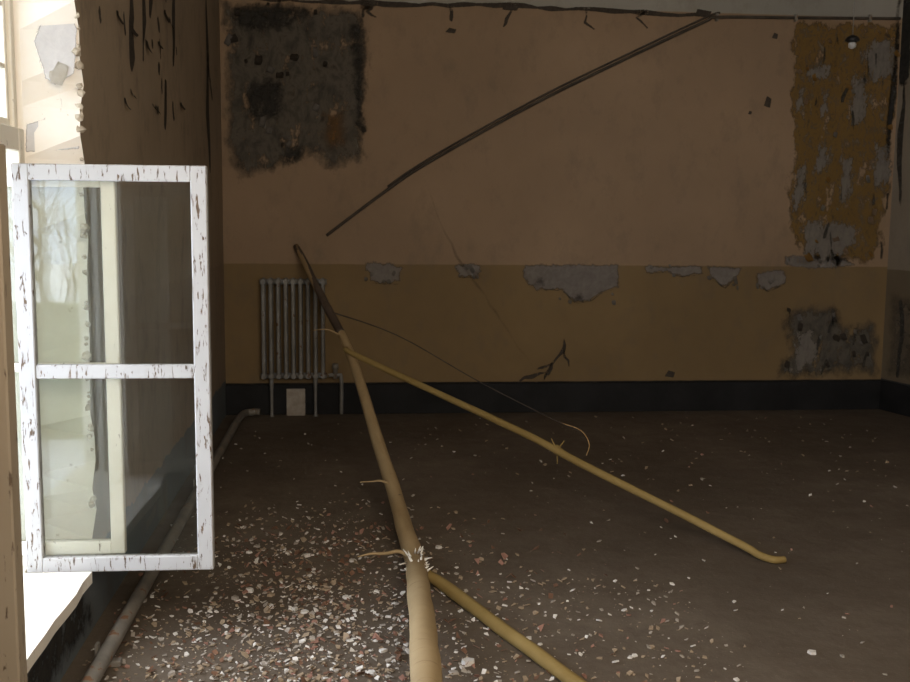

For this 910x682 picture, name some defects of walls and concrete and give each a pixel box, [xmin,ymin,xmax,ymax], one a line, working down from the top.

peeling [35,12,87,133]
peeling [116,0,185,130]
peeling [26,122,38,152]